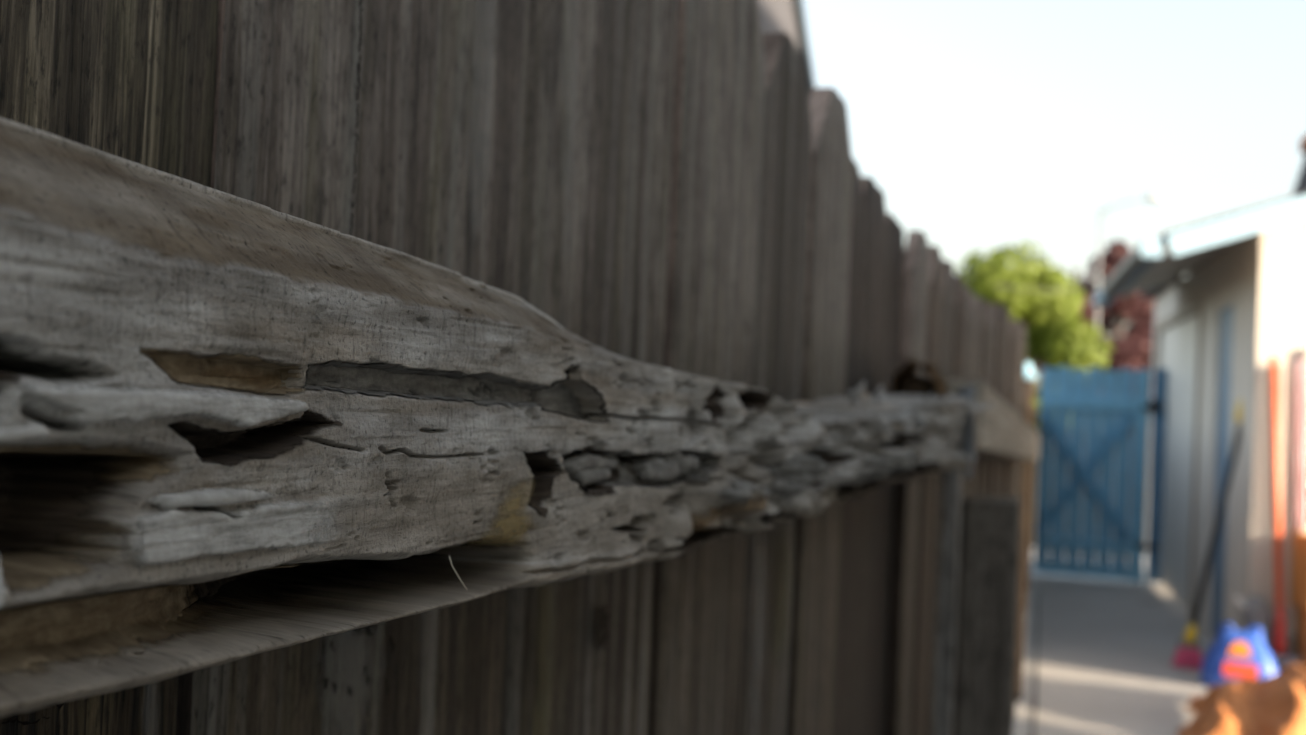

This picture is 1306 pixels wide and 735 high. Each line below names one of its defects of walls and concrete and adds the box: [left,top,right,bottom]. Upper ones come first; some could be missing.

spalling [0,343,610,466]
spalling [701,385,773,424]
spalling [847,359,994,478]
spalling [523,446,720,518]
spalling [804,448,943,498]
spalling [0,423,395,674]
spalling [410,555,467,590]
spalling [666,524,739,559]
spalling [757,508,797,526]